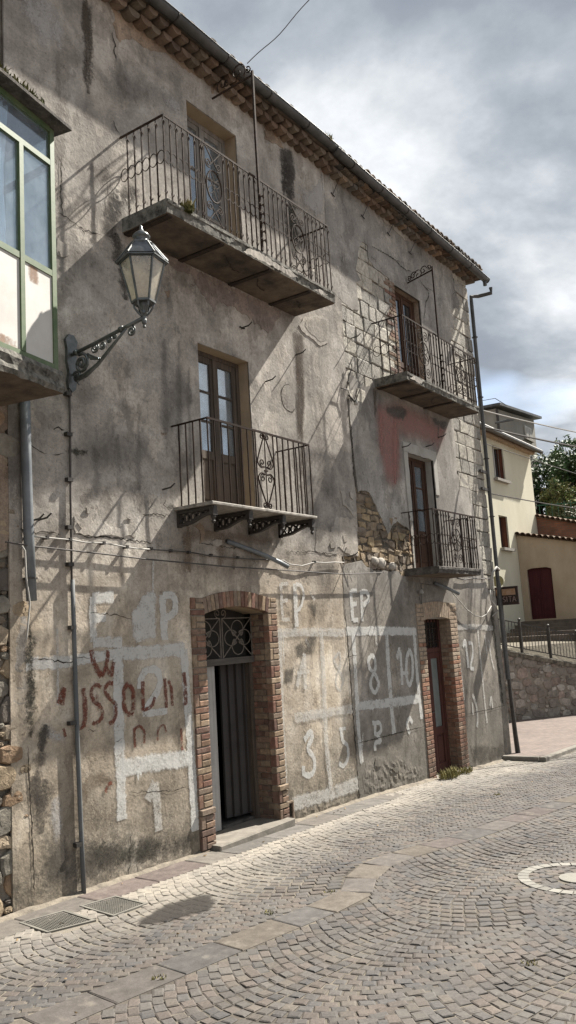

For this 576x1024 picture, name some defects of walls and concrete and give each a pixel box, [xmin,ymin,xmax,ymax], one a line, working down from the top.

water stain [82,0,93,94]
water stain [280,149,324,216]
flaking render [315,487,414,576]